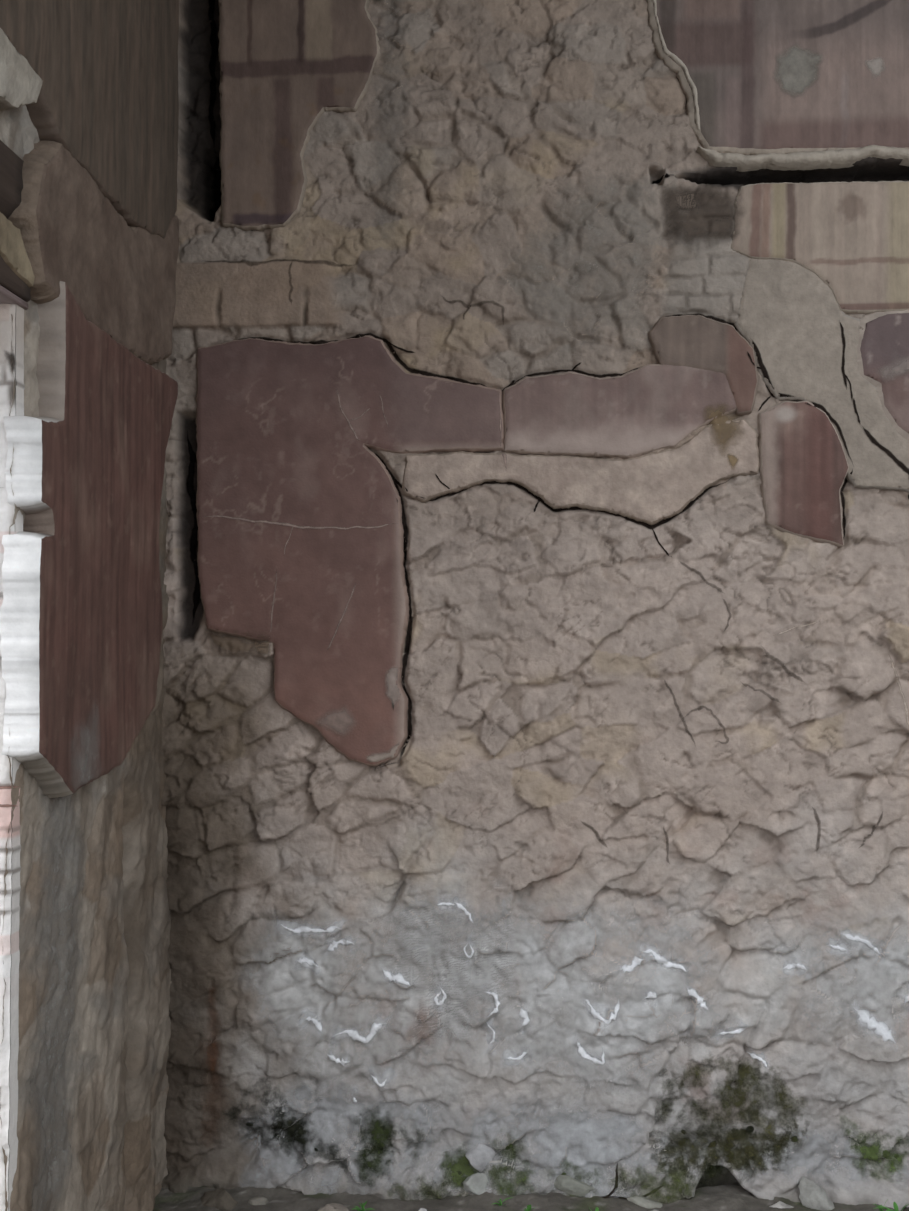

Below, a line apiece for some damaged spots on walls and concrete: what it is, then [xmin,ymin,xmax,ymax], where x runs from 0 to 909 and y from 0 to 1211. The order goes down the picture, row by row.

spalling [652,0,701,131]
crack [652,173,670,184]
spalling [663,187,737,242]
spalling [696,145,909,172]
flaking render [402,407,760,525]
crack [665,314,909,540]
crack [186,333,730,766]
damp [257,901,747,1087]
damp [780,931,909,1042]
damp [252,1086,432,1181]
crack [602,1163,662,1199]
damp [434,1112,865,1197]